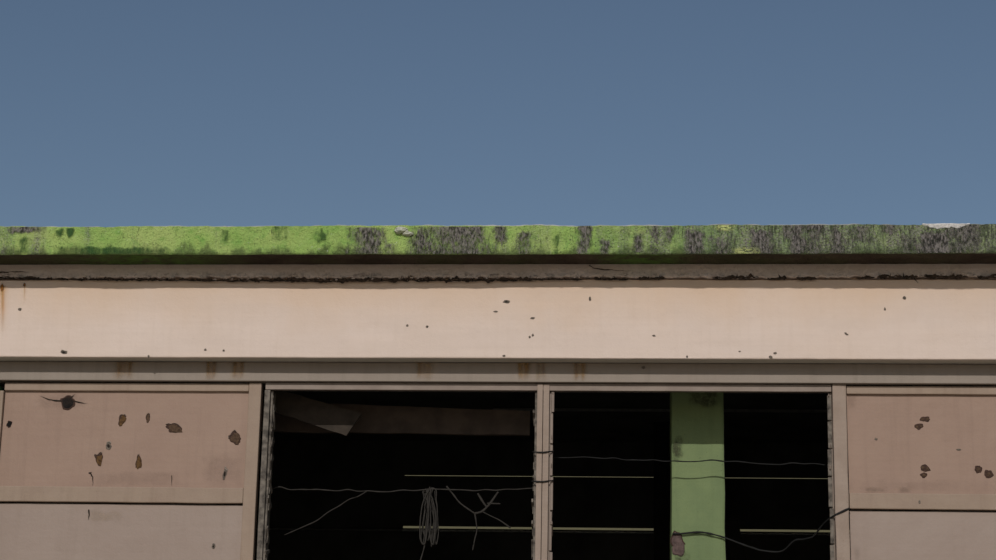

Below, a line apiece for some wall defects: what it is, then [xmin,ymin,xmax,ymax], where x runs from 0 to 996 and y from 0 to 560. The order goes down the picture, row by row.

mould [348,227,391,254]
mould [412,226,531,254]
mould [577,226,610,254]
mould [634,227,674,252]
mould [750,225,843,253]
mould [902,224,980,253]
peeling [165,423,182,433]
peeling [228,430,241,445]
peeling [94,441,112,466]
peeling [975,466,994,478]
spalling [670,530,685,557]